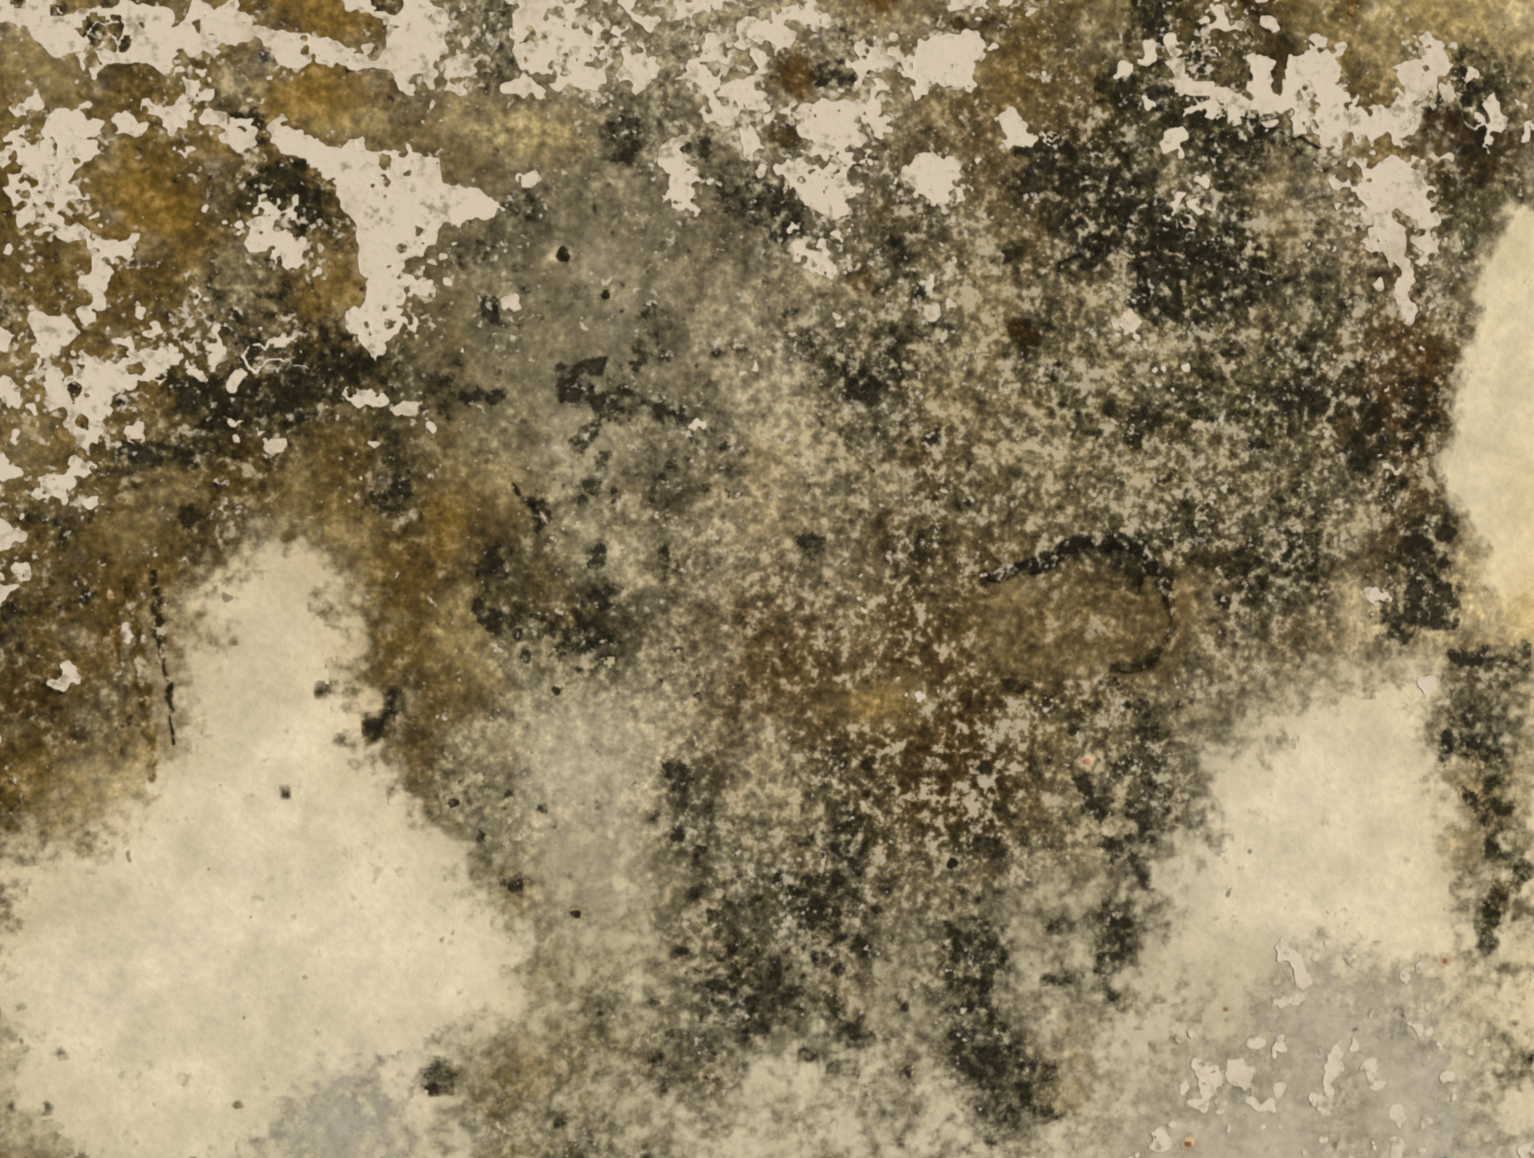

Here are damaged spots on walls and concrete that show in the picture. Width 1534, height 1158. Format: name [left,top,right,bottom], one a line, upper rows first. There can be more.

leakage [129,0,228,35]
leakage [370,0,404,15]
peeling [468,0,729,188]
peeling [657,135,714,217]
leakage [770,126,799,150]
peeling [676,0,1037,280]
peeling [994,107,1059,149]
peeling [1113,0,1534,325]
leakage [1412,71,1457,116]
peeling [0,0,505,510]
mould [1456,878,1512,950]
mould [420,1058,458,1097]